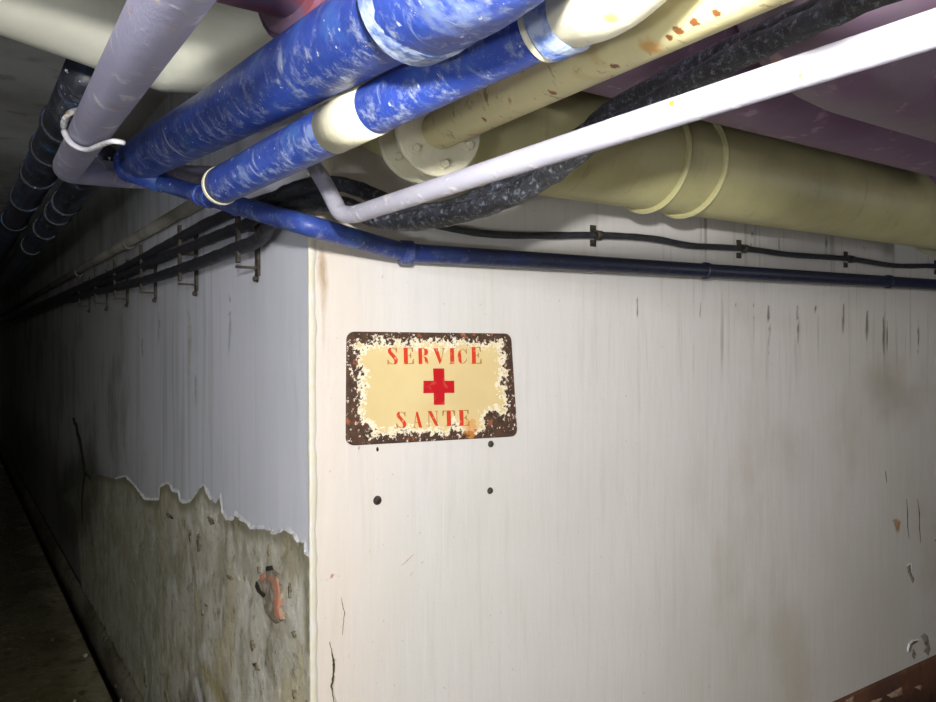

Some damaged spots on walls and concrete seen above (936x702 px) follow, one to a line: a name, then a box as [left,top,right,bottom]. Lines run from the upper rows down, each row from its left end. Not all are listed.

crack [72,418,91,525]
flaking render [61,237,318,702]
crack [329,598,345,702]
peeling [870,687,904,702]
peeling [907,633,930,659]